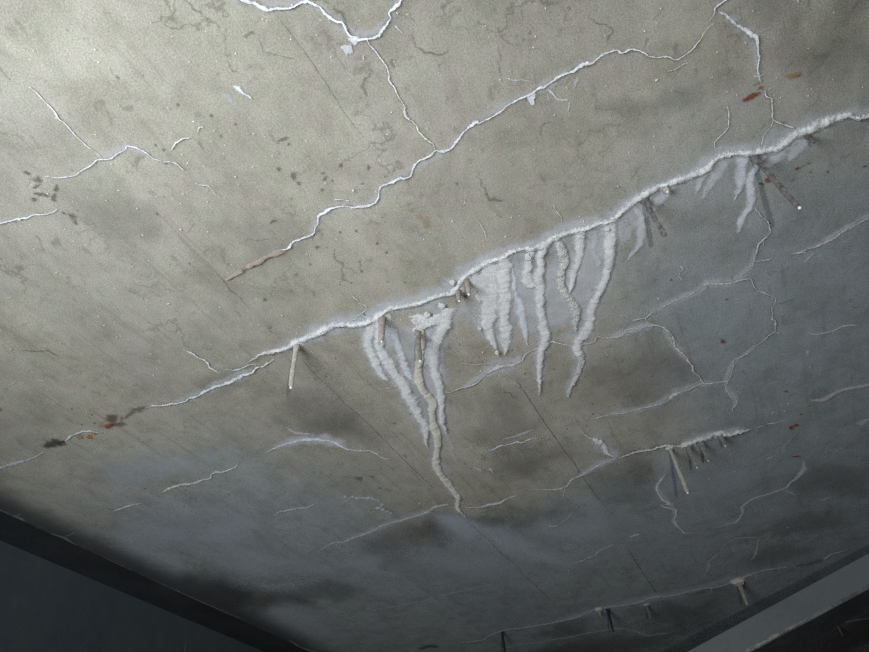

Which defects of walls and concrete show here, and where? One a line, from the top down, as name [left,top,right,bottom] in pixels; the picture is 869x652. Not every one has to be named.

crack [0,84,217,224]
crack [127,0,869,552]
crack [0,453,43,469]
crack [462,540,788,643]